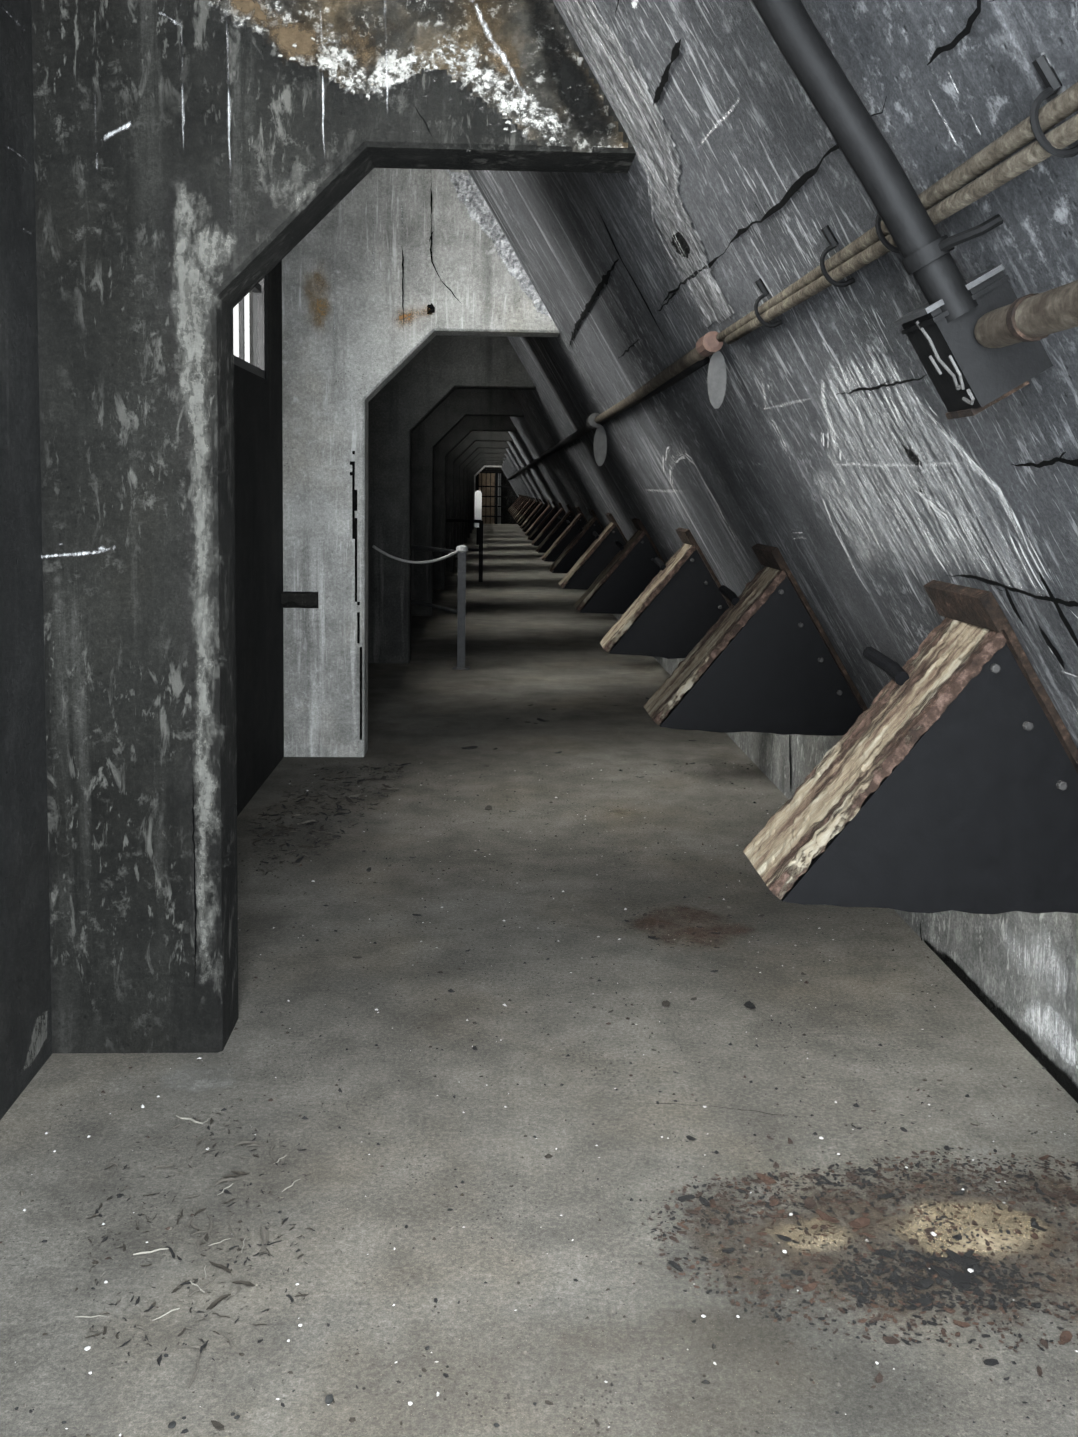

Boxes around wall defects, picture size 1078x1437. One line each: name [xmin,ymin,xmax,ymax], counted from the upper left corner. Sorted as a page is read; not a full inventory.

leakage [210,0,298,32]
peeling [210,0,628,152]
crack [653,39,681,105]
crack [927,0,994,65]
leakage [278,0,735,329]
crack [658,144,839,311]
crack [569,259,619,346]
crack [1012,452,1078,468]
crack [947,572,1078,670]
leakage [924,940,1078,1103]